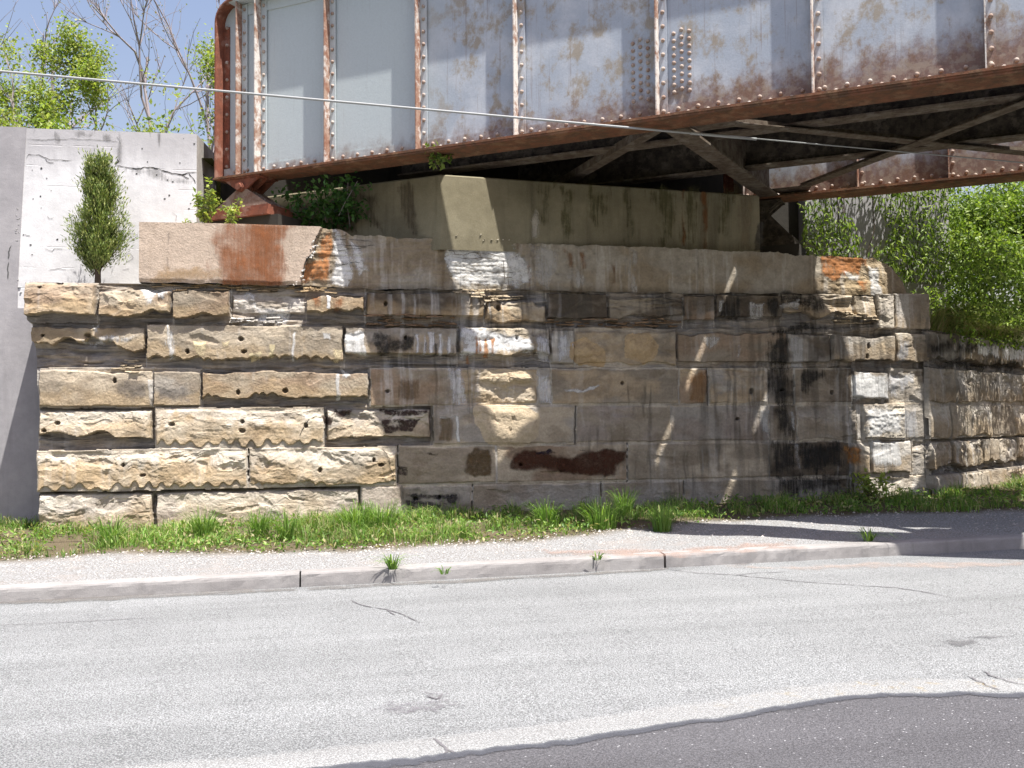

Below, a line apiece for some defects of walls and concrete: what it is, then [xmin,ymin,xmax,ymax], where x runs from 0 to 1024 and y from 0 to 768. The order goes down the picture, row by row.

crack [28,137,208,184]
corrosion [216,224,283,286]
corrosion [821,256,866,290]
damp [719,291,826,320]
damp [324,328,567,441]
damp [761,323,842,498]